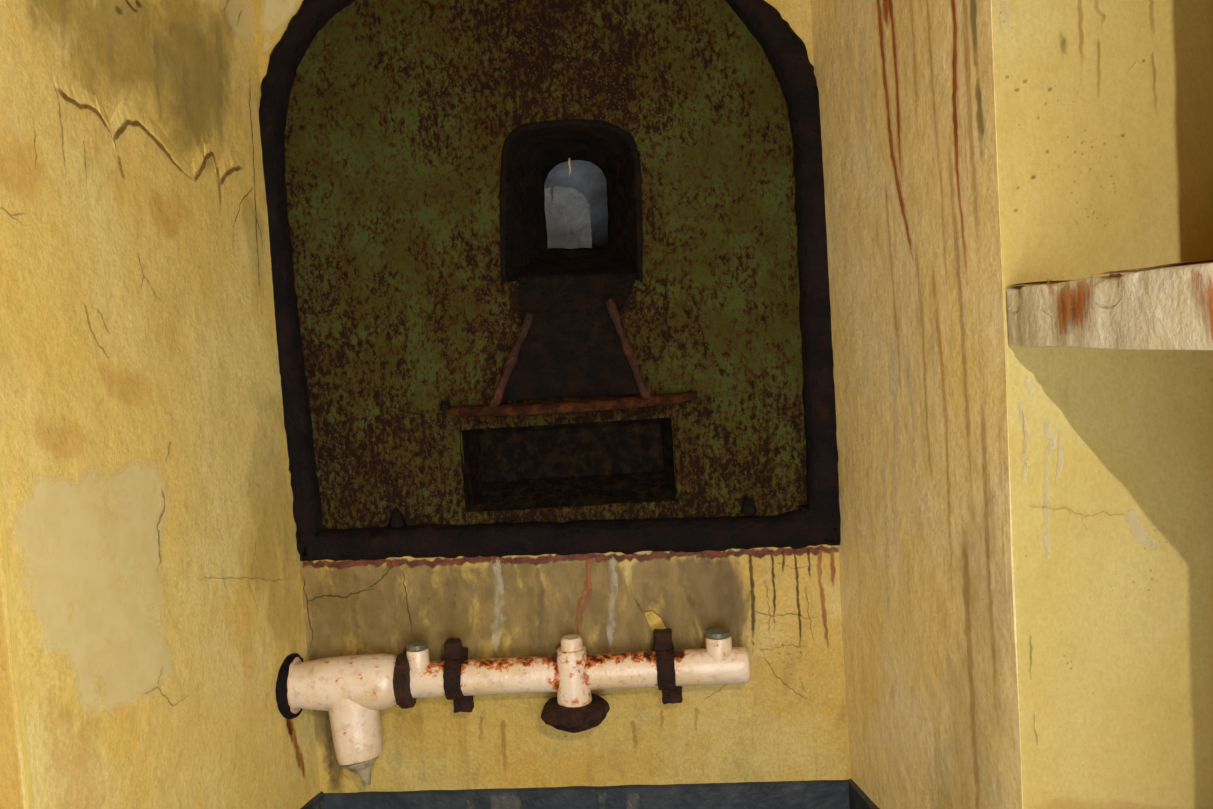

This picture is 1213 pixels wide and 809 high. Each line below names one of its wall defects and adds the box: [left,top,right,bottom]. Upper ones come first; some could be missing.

rust [1007,258,1213,340]
rust [303,545,839,644]
rust [287,718,304,776]